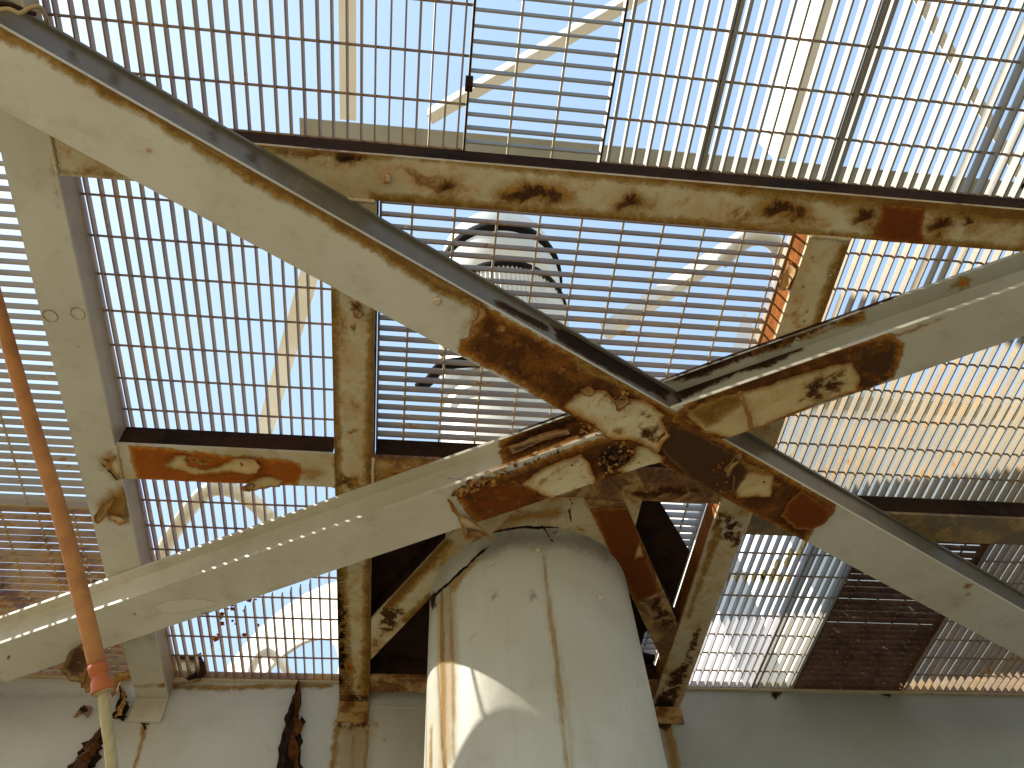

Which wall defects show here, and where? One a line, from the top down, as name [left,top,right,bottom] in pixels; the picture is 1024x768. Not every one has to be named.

rust [0,27,1024,633]
peeling [94,453,129,525]
peeling [447,354,671,540]
crack [432,499,574,601]
rust [548,603,563,724]
rust [654,628,702,707]